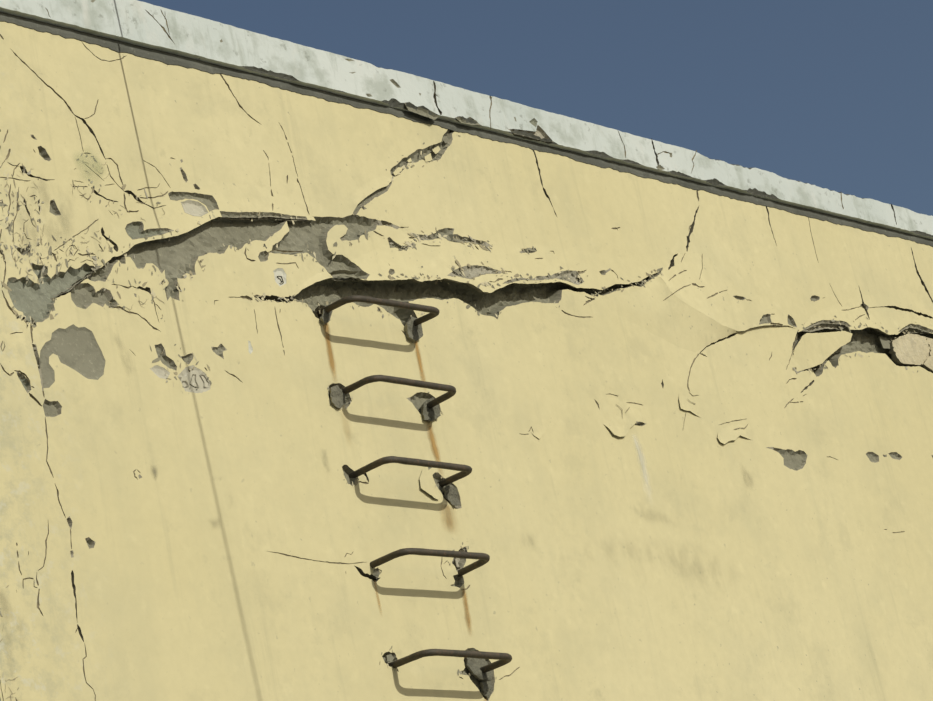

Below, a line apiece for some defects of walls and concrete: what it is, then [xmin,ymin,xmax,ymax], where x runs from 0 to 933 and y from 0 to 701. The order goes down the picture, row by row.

crack [147,11,175,44]
flaking render [125,221,174,239]
flaking render [388,228,493,252]
flaking render [1,226,165,417]
flaking render [150,344,212,393]
corrosion [325,323,334,370]
crack [0,34,727,701]
spalling [402,316,423,343]
crack [687,333,736,392]
corrosion [429,426,439,461]
flaking render [766,447,808,471]
spalling [457,648,519,701]